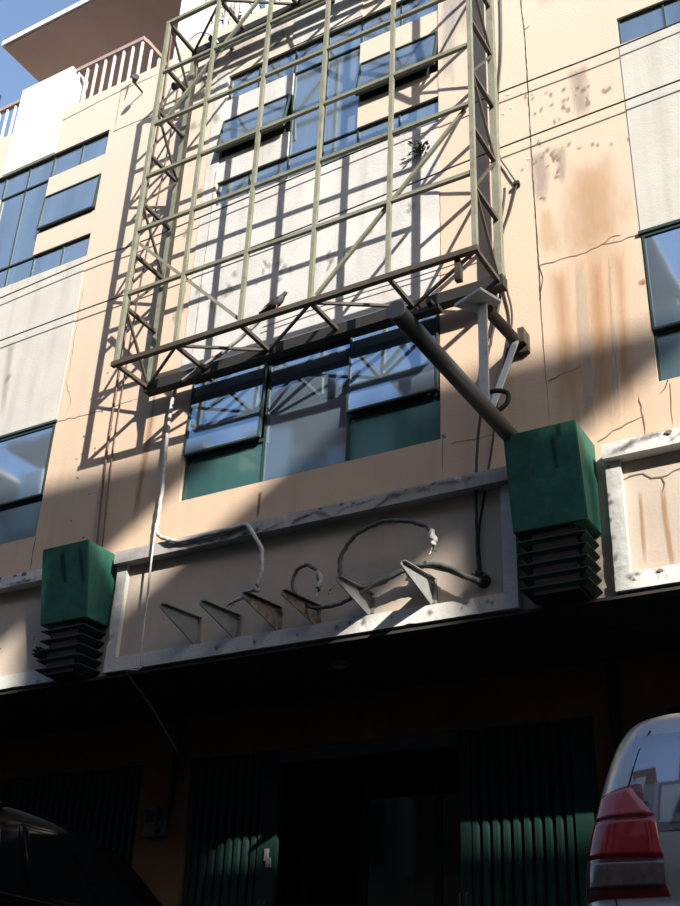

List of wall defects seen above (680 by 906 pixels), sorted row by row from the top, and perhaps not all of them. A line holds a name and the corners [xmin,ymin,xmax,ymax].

crack [520,0,638,425]
crack [598,399,645,442]
crack [623,468,680,490]
corrosion [663,498,672,553]